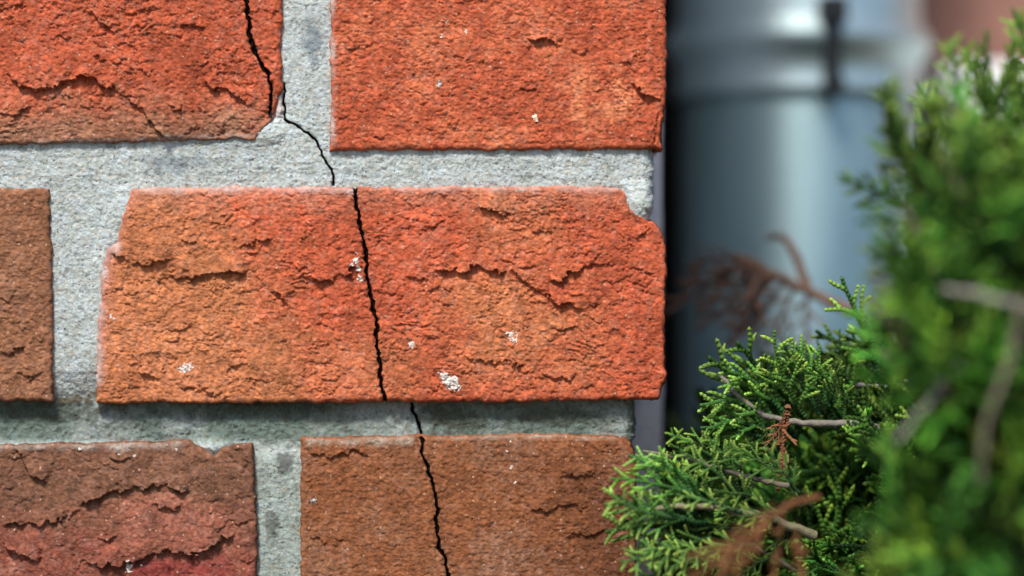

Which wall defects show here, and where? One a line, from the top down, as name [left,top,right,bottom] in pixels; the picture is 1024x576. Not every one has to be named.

crack [245,0,450,576]